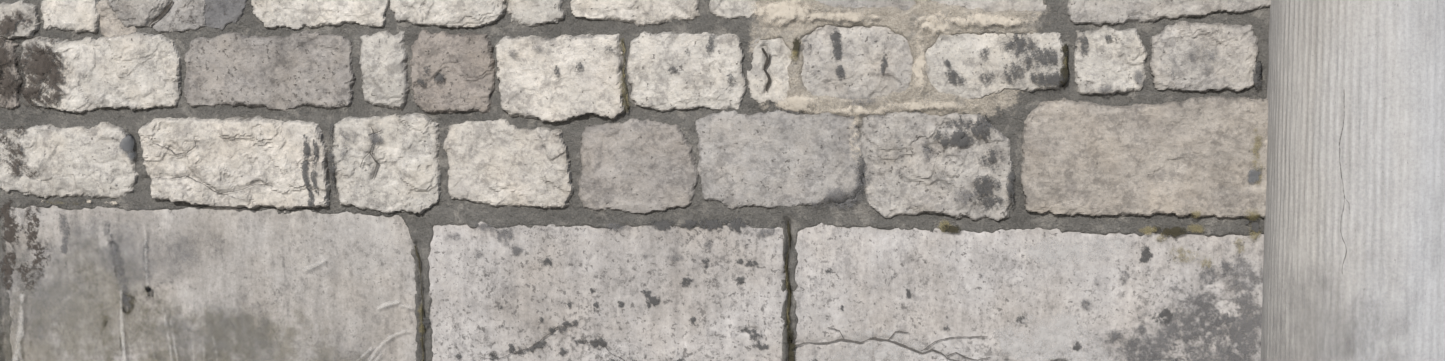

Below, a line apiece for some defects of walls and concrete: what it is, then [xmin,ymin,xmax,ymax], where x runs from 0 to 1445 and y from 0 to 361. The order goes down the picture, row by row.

water stain [0,200,69,290]
crack [456,317,637,361]
crack [740,327,991,361]